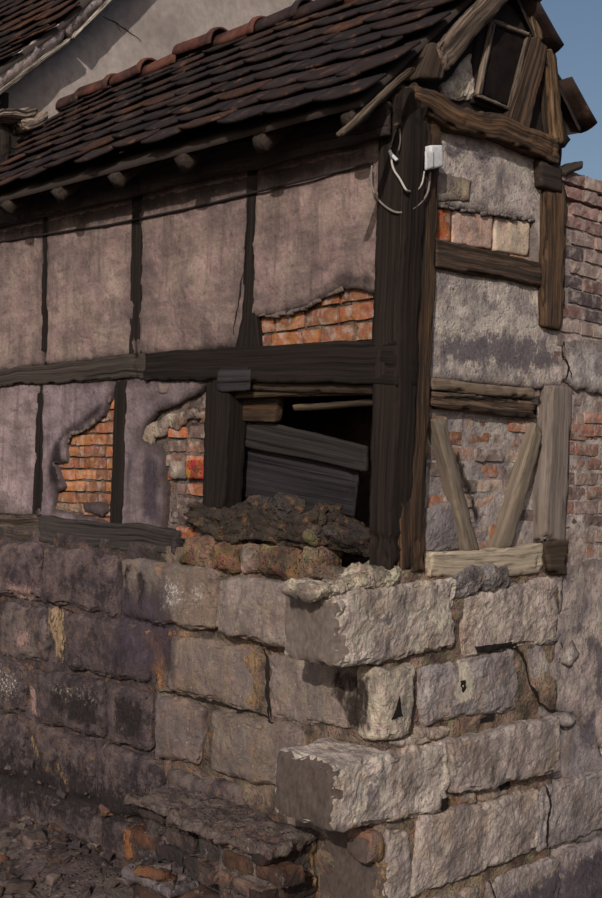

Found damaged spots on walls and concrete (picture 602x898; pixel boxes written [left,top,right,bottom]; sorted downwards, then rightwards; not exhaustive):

flaking render [435,172,535,259]
flaking render [258,286,374,346]
flaking render [158,383,169,394]
flaking render [56,396,114,521]
flaking render [142,392,206,538]
crack [486,643,564,713]